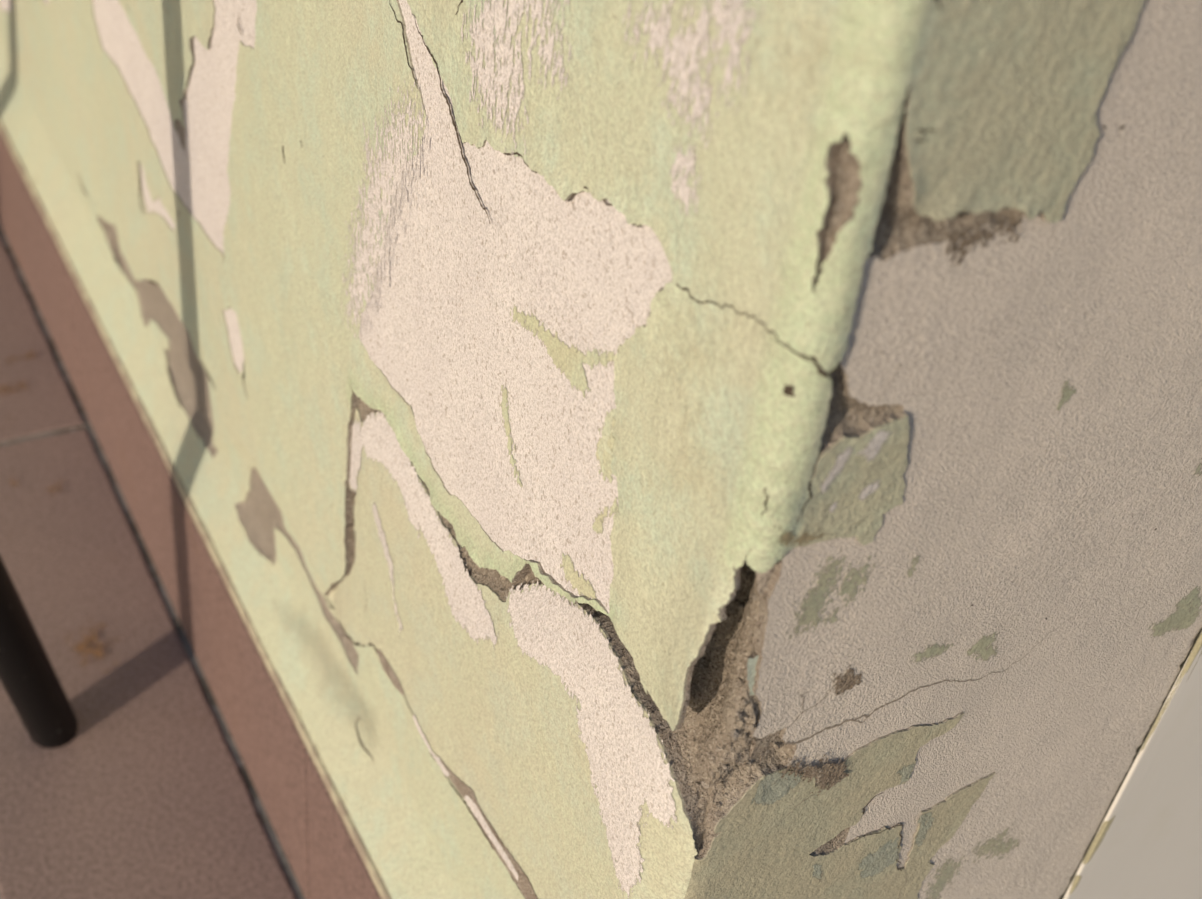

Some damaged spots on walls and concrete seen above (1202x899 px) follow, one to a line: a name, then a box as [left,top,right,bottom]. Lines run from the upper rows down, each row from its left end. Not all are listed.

peeling [93,0,257,254]
flaking render [824,142,861,261]
flaking render [868,124,1022,261]
flaking render [99,217,218,457]
peeling [358,0,672,613]
crack [677,283,841,378]
flaking render [820,362,903,448]
flaking render [236,468,358,673]
flaking render [674,563,803,855]
spalling [829,665,862,696]
crack [785,604,1092,745]
crack [430,753,526,899]